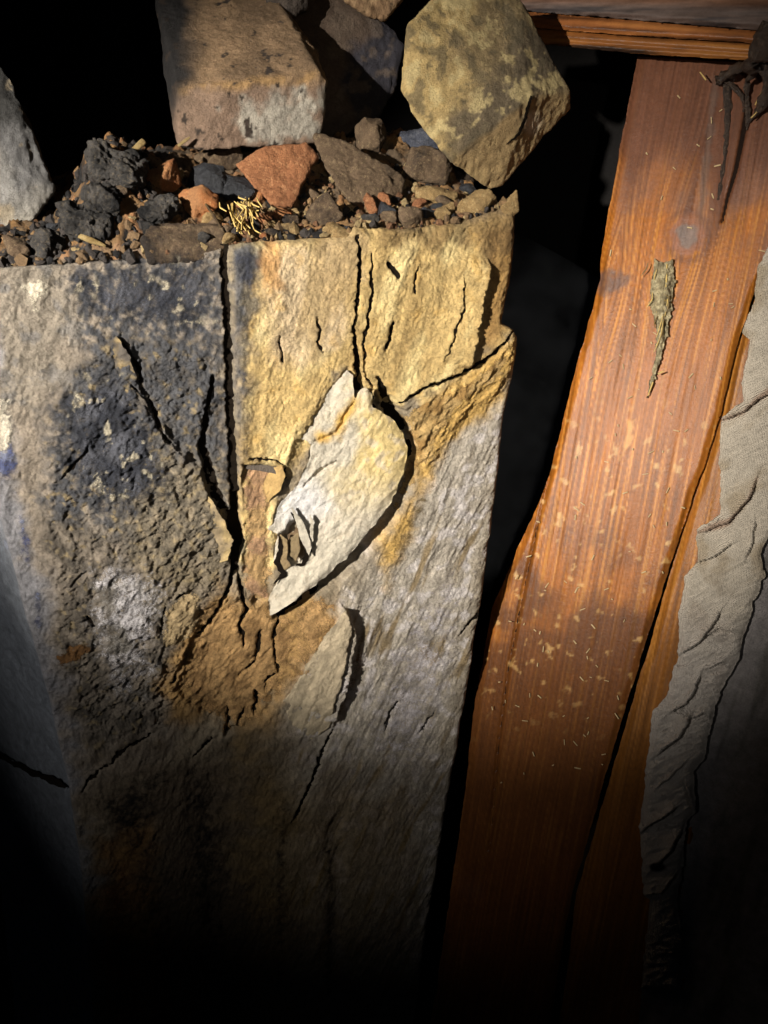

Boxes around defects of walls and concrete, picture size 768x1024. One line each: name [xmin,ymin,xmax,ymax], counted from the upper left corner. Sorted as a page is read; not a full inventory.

crack [316,320,324,353]
crack [351,236,514,418]
crack [120,340,172,443]
crack [192,243,287,757]
crack [159,593,186,635]
crack [458,612,479,636]
crack [384,701,399,731]
crack [0,733,151,793]